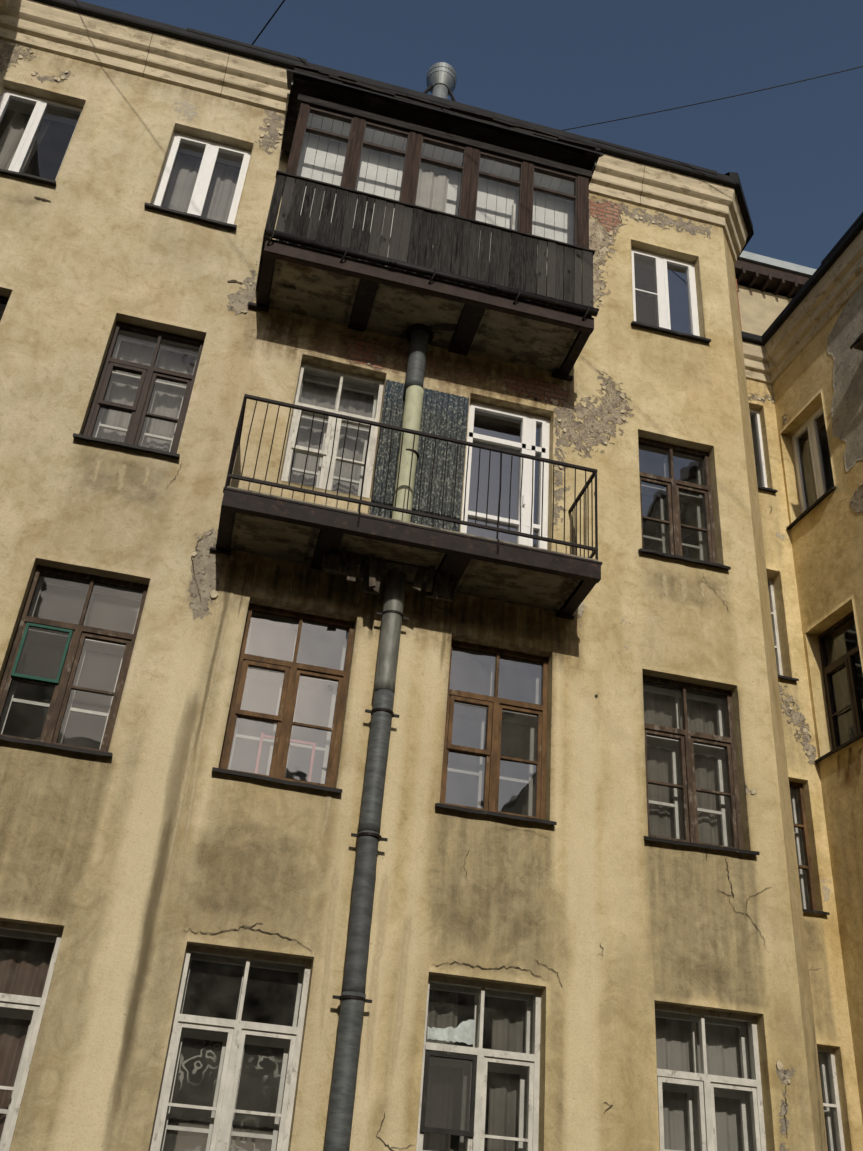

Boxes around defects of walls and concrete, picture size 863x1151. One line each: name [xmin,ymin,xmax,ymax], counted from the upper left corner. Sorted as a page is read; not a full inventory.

flaking render [0,40,75,84]
spalling [589,196,712,307]
flaking render [500,369,634,530]
spalling [185,527,237,620]
flaking render [779,684,817,766]
crack [706,851,767,949]
spalling [776,1060,795,1151]